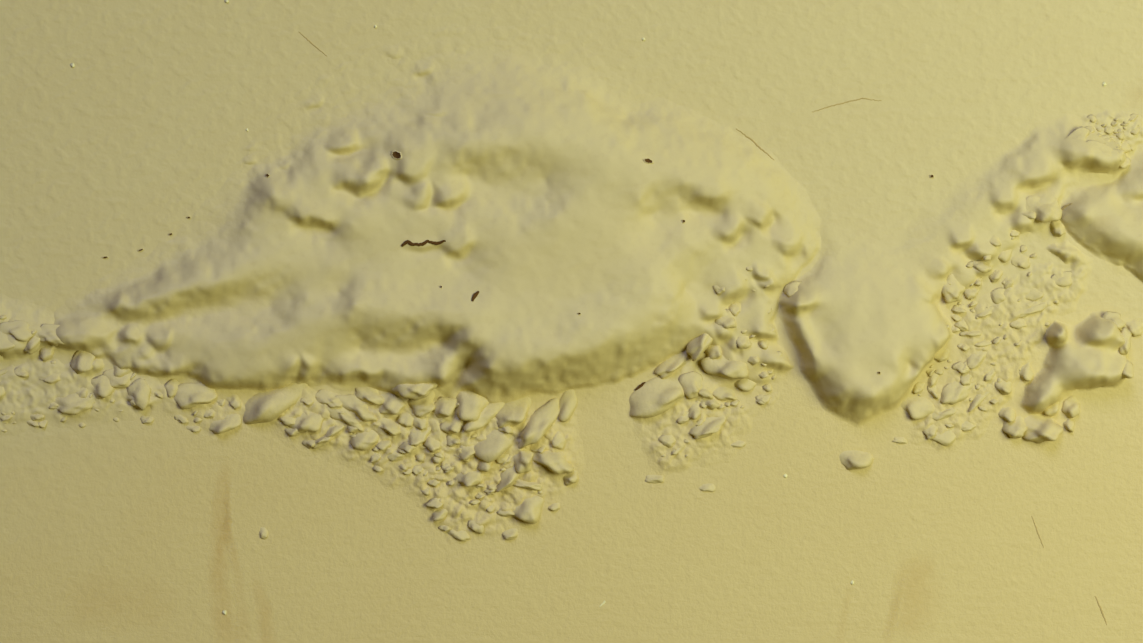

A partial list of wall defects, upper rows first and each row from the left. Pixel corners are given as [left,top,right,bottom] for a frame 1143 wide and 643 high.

peeling [0,345,586,544]
peeling [629,350,780,483]
peeling [892,220,1094,456]